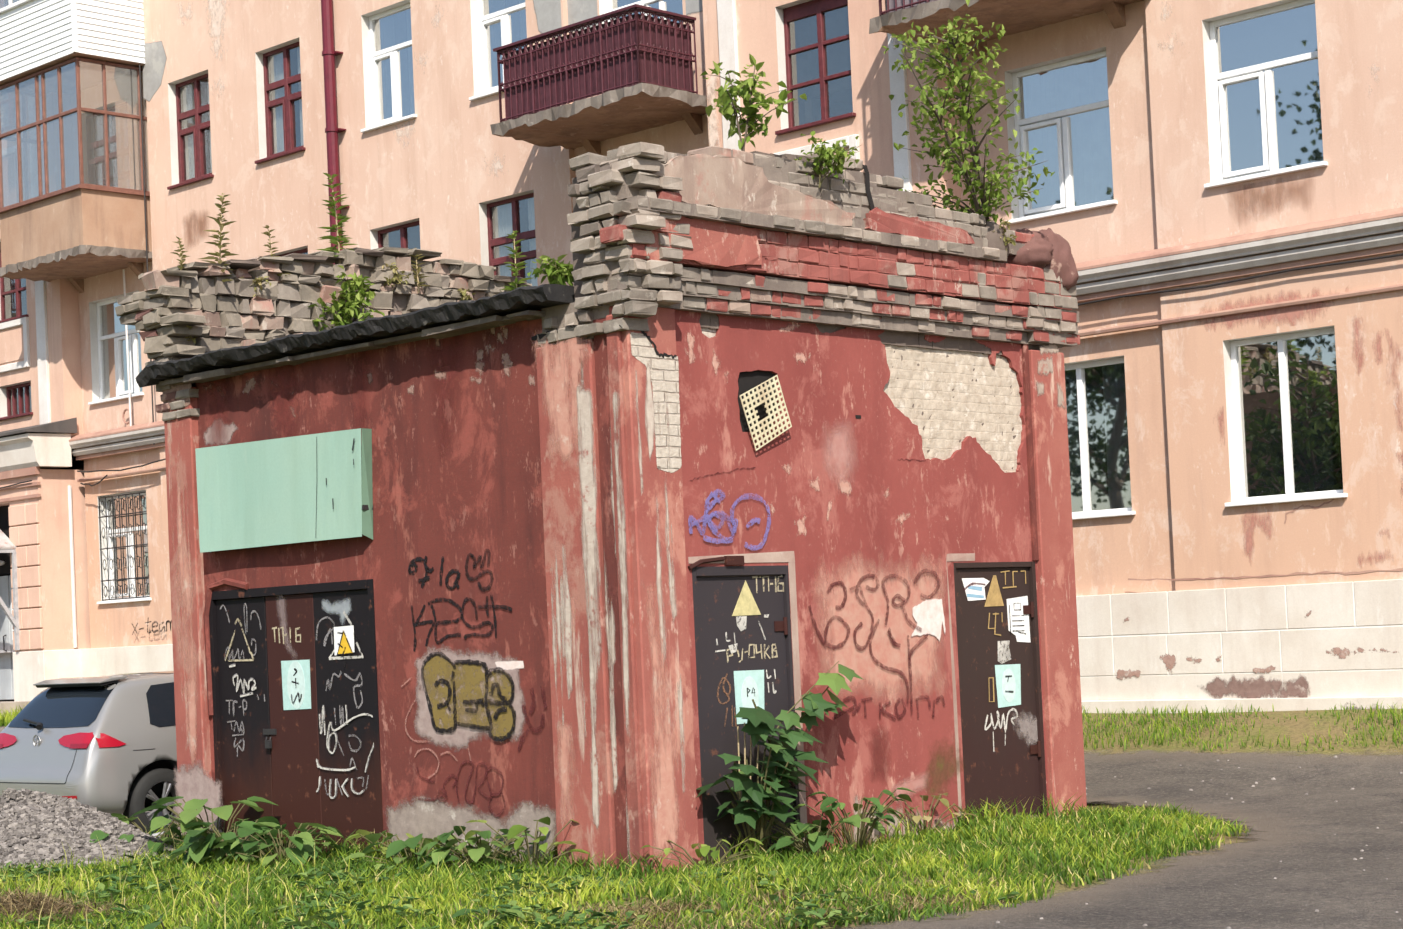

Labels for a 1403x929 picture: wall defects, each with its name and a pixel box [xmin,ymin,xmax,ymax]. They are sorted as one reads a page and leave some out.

peeling [471,328,513,383]
peeling [1037,344,1066,408]
flaking render [630,328,728,492]
flaking render [883,344,1022,473]
peeling [794,516,807,535]
peeling [827,481,851,520]
flaking render [388,337,629,869]
peeling [649,491,684,851]
peeling [1116,670,1141,680]
peeling [1160,654,1221,671]
peeling [1326,647,1397,659]